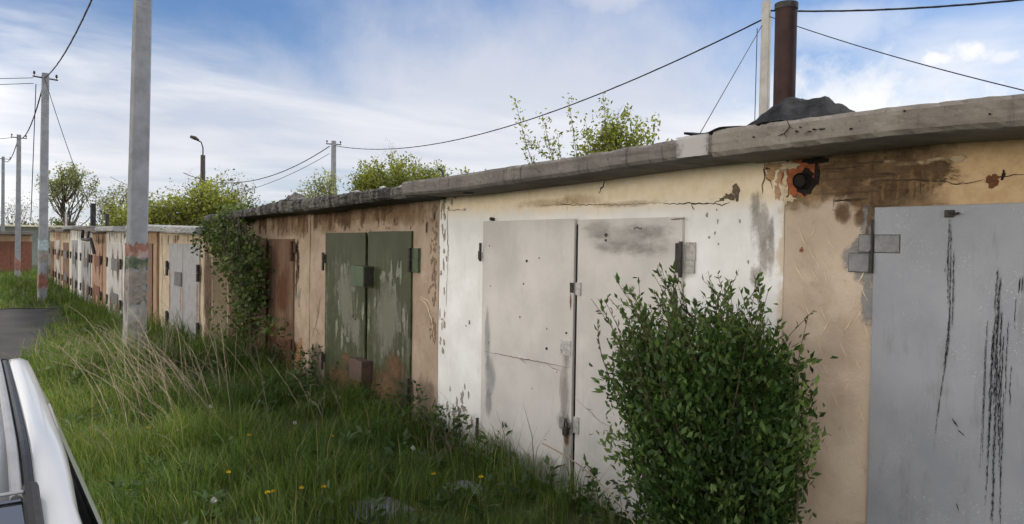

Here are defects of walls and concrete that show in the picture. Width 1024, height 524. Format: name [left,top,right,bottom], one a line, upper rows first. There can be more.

crack [538,181,729,210]
spalling [764,157,829,205]
crack [824,162,980,211]
damp [883,155,966,167]
spalling [986,170,1006,189]
damp [752,196,774,285]
flaking render [316,197,467,359]
crack [484,351,563,370]